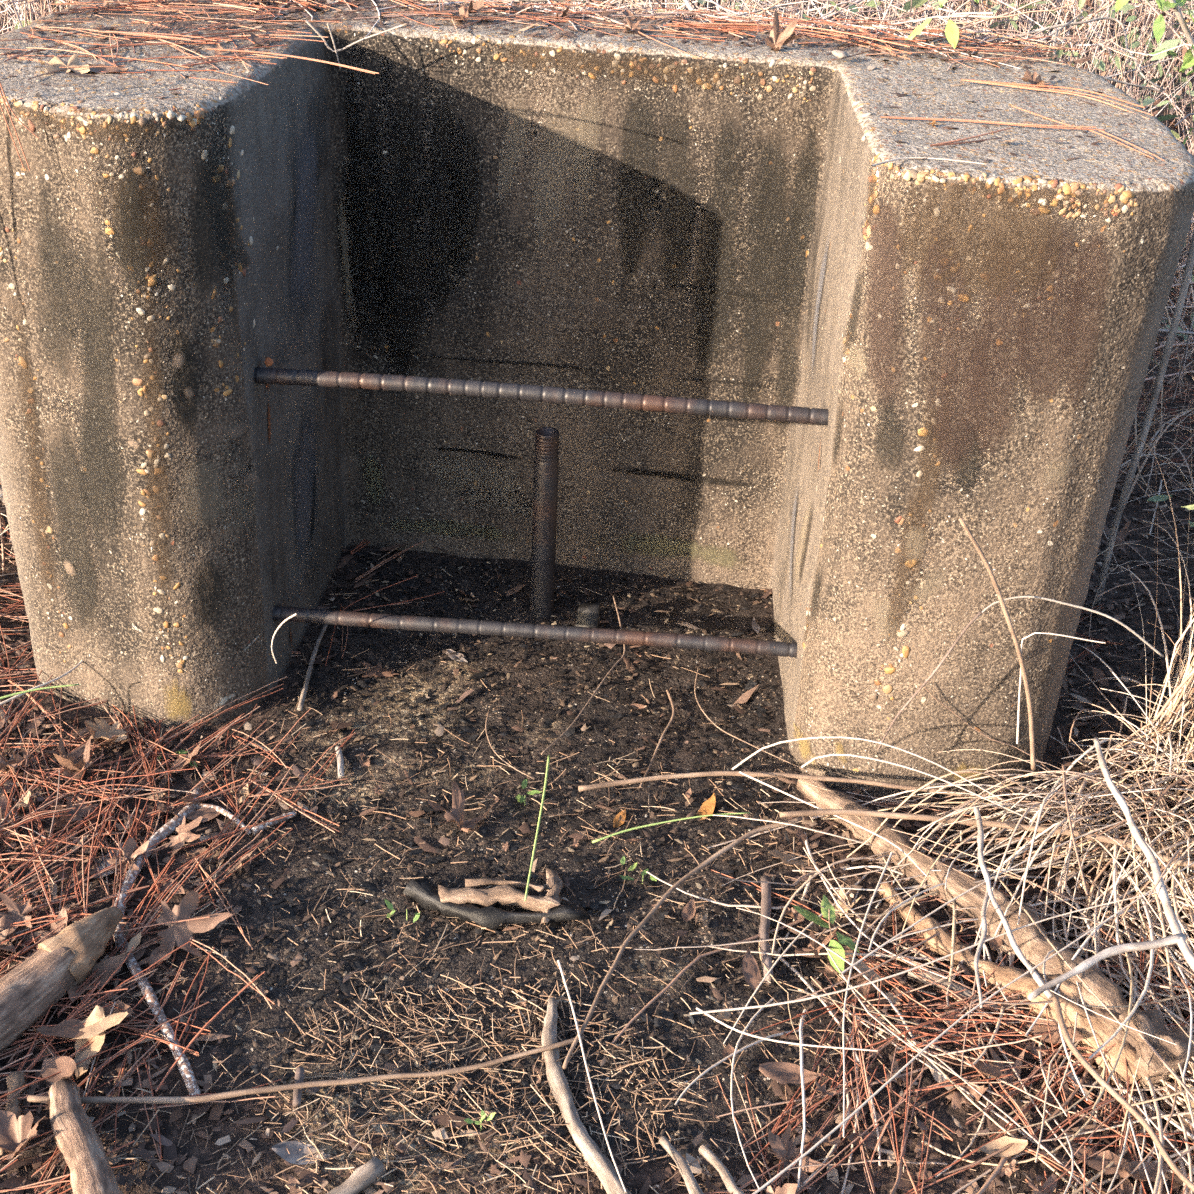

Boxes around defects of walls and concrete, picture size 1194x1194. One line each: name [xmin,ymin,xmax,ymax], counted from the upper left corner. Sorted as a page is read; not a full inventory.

water stain [43,219,117,622]
water stain [119,178,144,279]
water stain [175,340,195,427]
water stain [347,102,478,372]
water stain [619,103,656,273]
water stain [666,121,693,282]
water stain [697,138,816,407]
water stain [850,209,900,389]
water stain [925,235,1105,488]